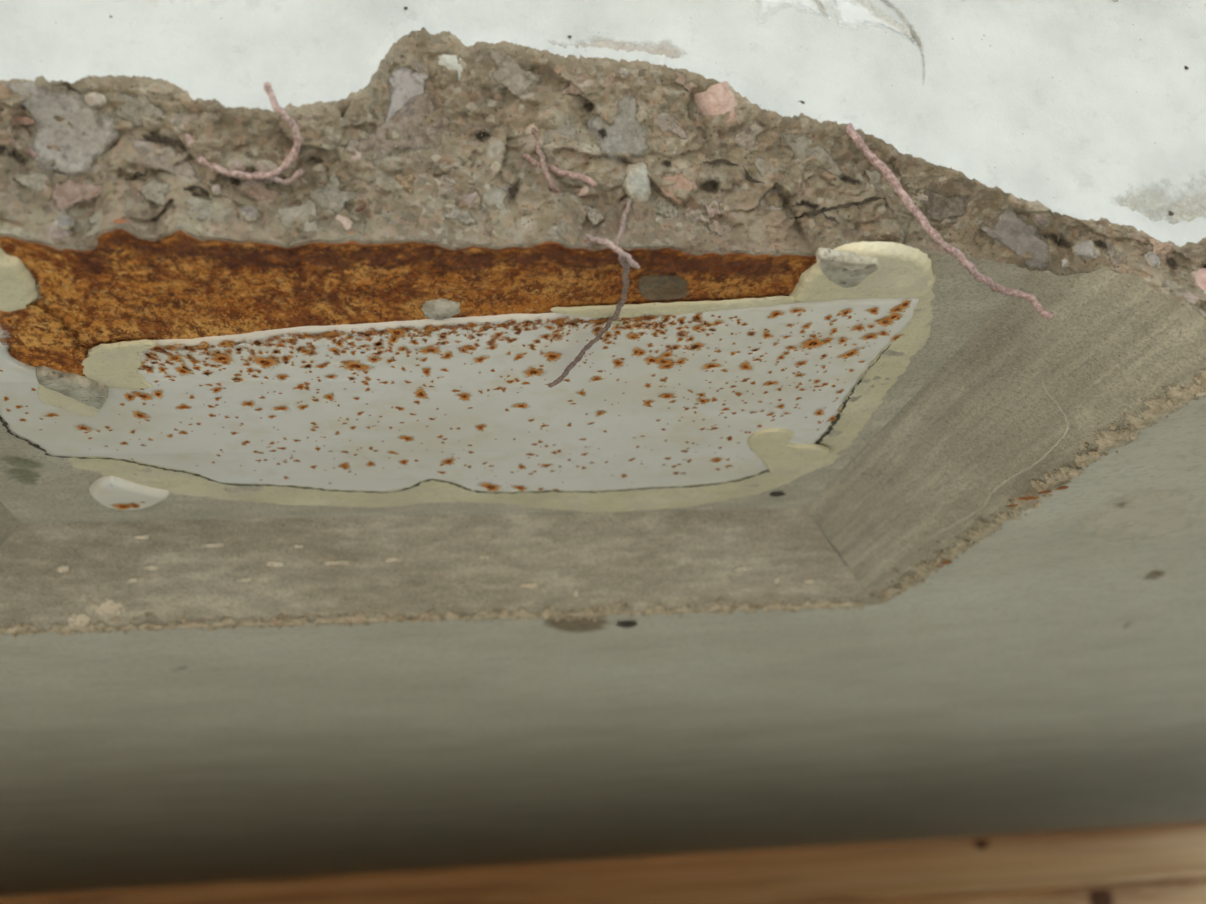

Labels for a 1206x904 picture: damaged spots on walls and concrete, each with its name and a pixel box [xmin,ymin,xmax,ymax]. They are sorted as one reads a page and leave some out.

spalling [760,0,923,56]
spalling [0,27,1206,320]
corrosion [113,502,145,511]
corrosion [0,231,911,492]
peeling [0,297,919,492]
spalling [0,358,1206,638]